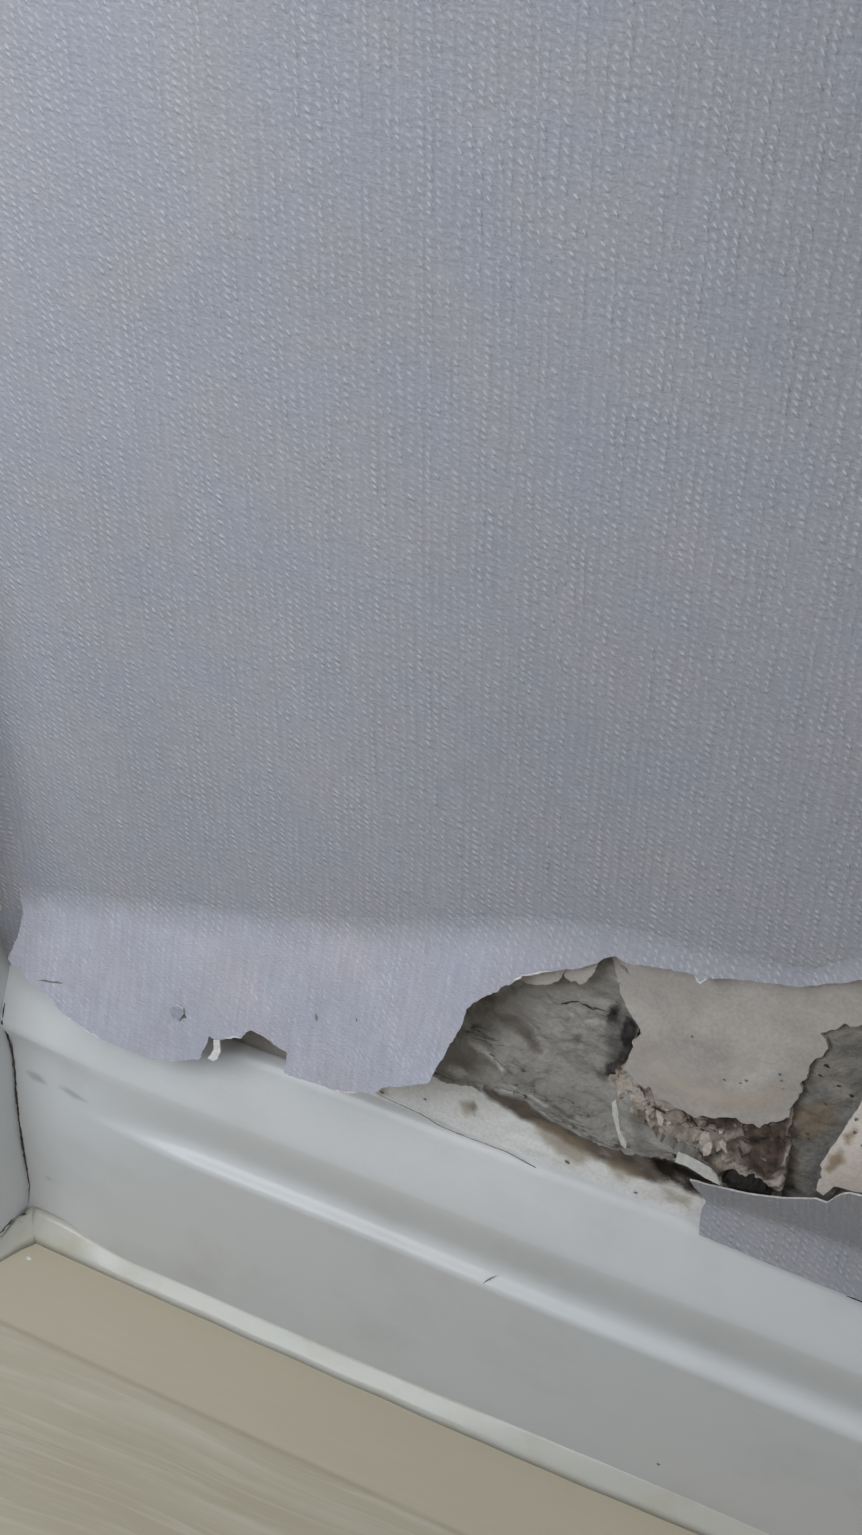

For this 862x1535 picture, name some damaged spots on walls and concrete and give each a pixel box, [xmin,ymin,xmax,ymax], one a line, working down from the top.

spalling [367,957,862,1220]